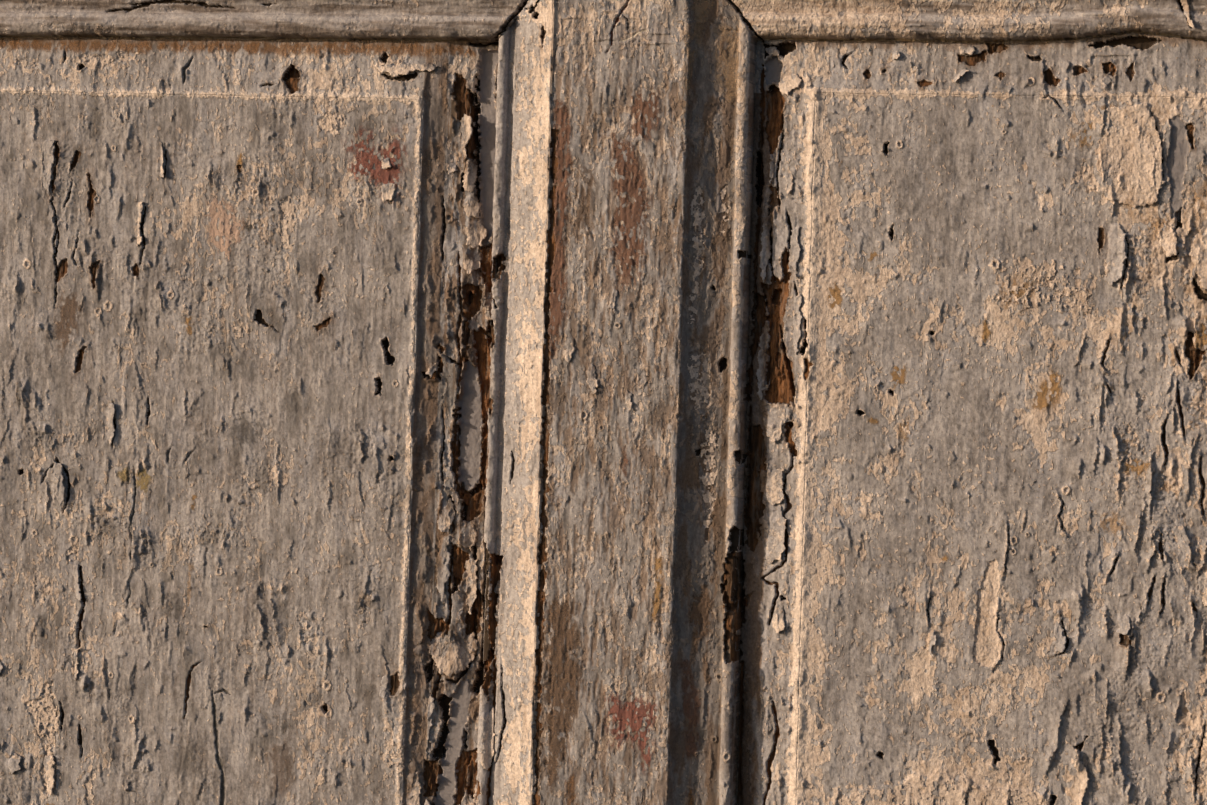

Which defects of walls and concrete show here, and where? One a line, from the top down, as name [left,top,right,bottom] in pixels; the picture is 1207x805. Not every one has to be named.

crack [469,0,539,47]
crack [607,0,649,52]
crack [728,0,764,42]
peeling [1028,55,1088,107]
spalling [1090,36,1162,89]
peeling [1079,103,1207,301]
peeling [385,48,506,805]
peeling [721,42,813,805]
peeling [1175,332,1205,436]
crack [759,454,794,625]
crack [763,701,780,805]
crack [1194,725,1205,798]